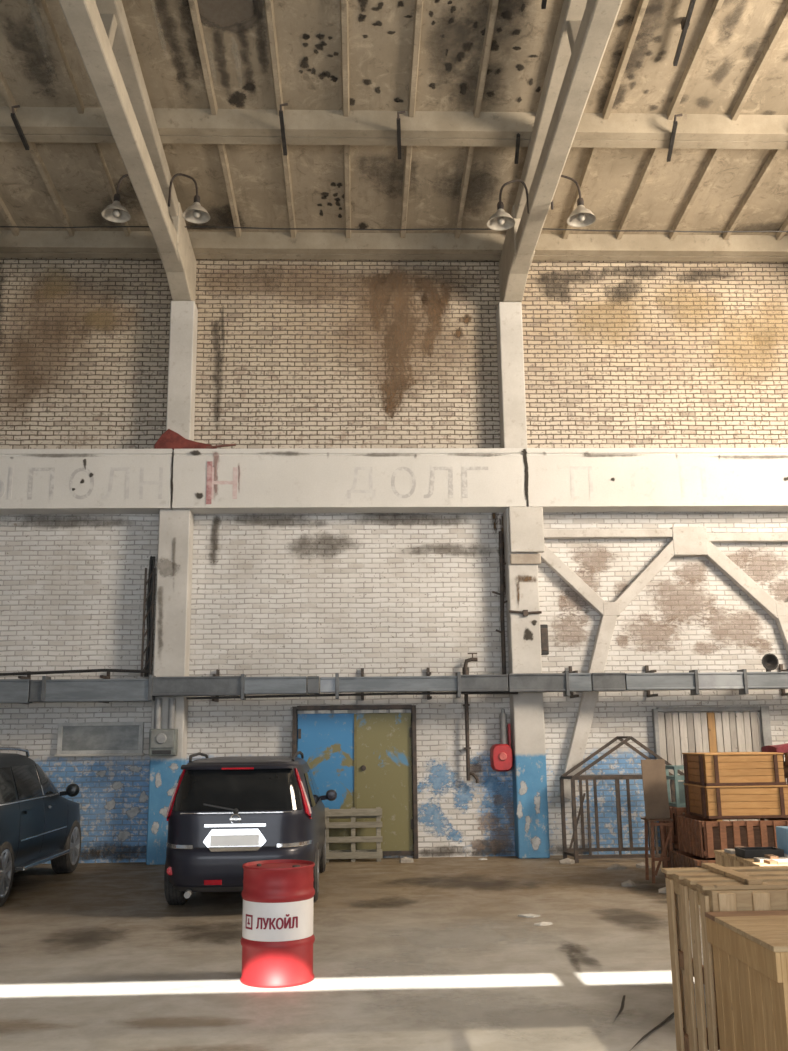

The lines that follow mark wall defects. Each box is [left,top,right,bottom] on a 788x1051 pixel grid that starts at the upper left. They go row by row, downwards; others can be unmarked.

damp [157,0,199,88]
damp [214,32,229,87]
damp [239,0,268,93]
damp [600,0,664,109]
damp [455,175,493,204]
damp [541,271,590,300]
damp [603,266,661,301]
damp [680,270,726,281]
damp [27,517,104,528]
peeling [97,763,178,834]
peeling [417,760,540,850]